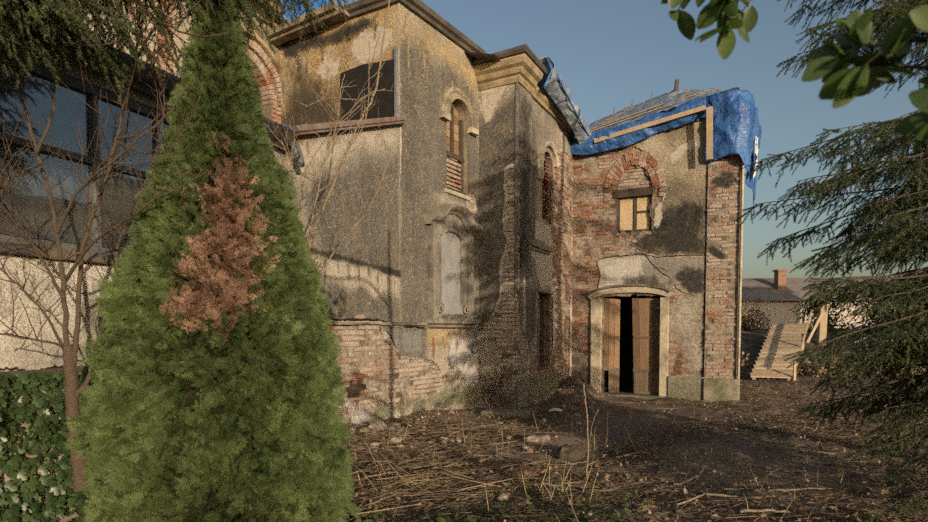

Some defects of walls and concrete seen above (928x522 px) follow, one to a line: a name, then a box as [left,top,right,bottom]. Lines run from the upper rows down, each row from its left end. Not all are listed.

water stain [282,19,377,126]
peeling [316,26,394,83]
water stain [634,202,725,259]
spalling [326,131,741,427]
water stain [624,267,705,294]